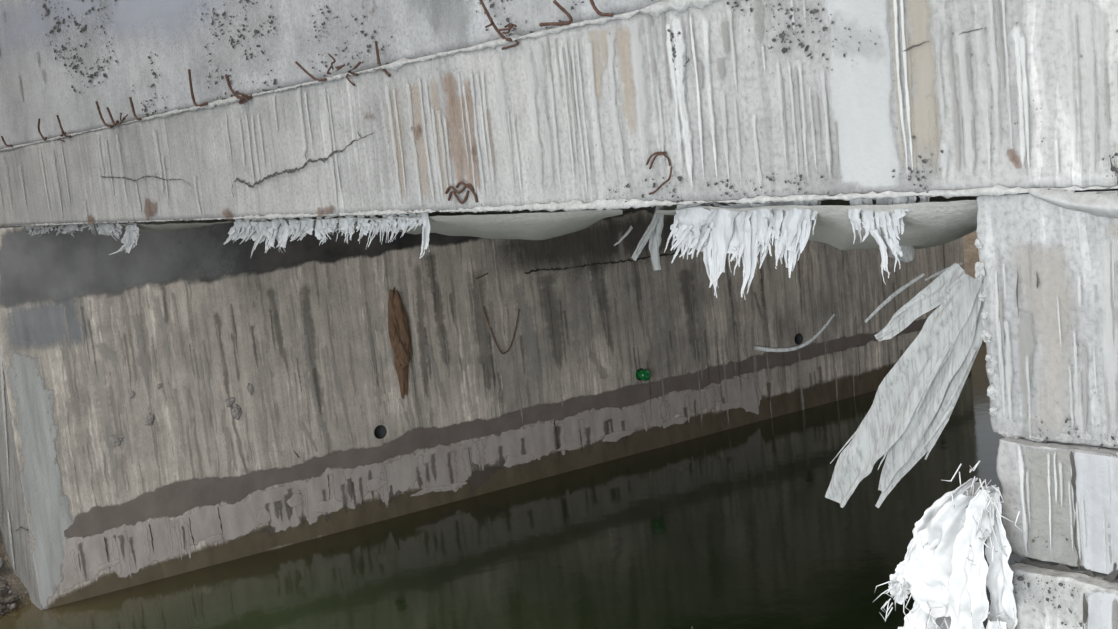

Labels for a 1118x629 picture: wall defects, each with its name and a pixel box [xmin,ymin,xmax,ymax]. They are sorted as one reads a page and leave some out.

damp [0,0,205,44]
crack [232,131,373,197]